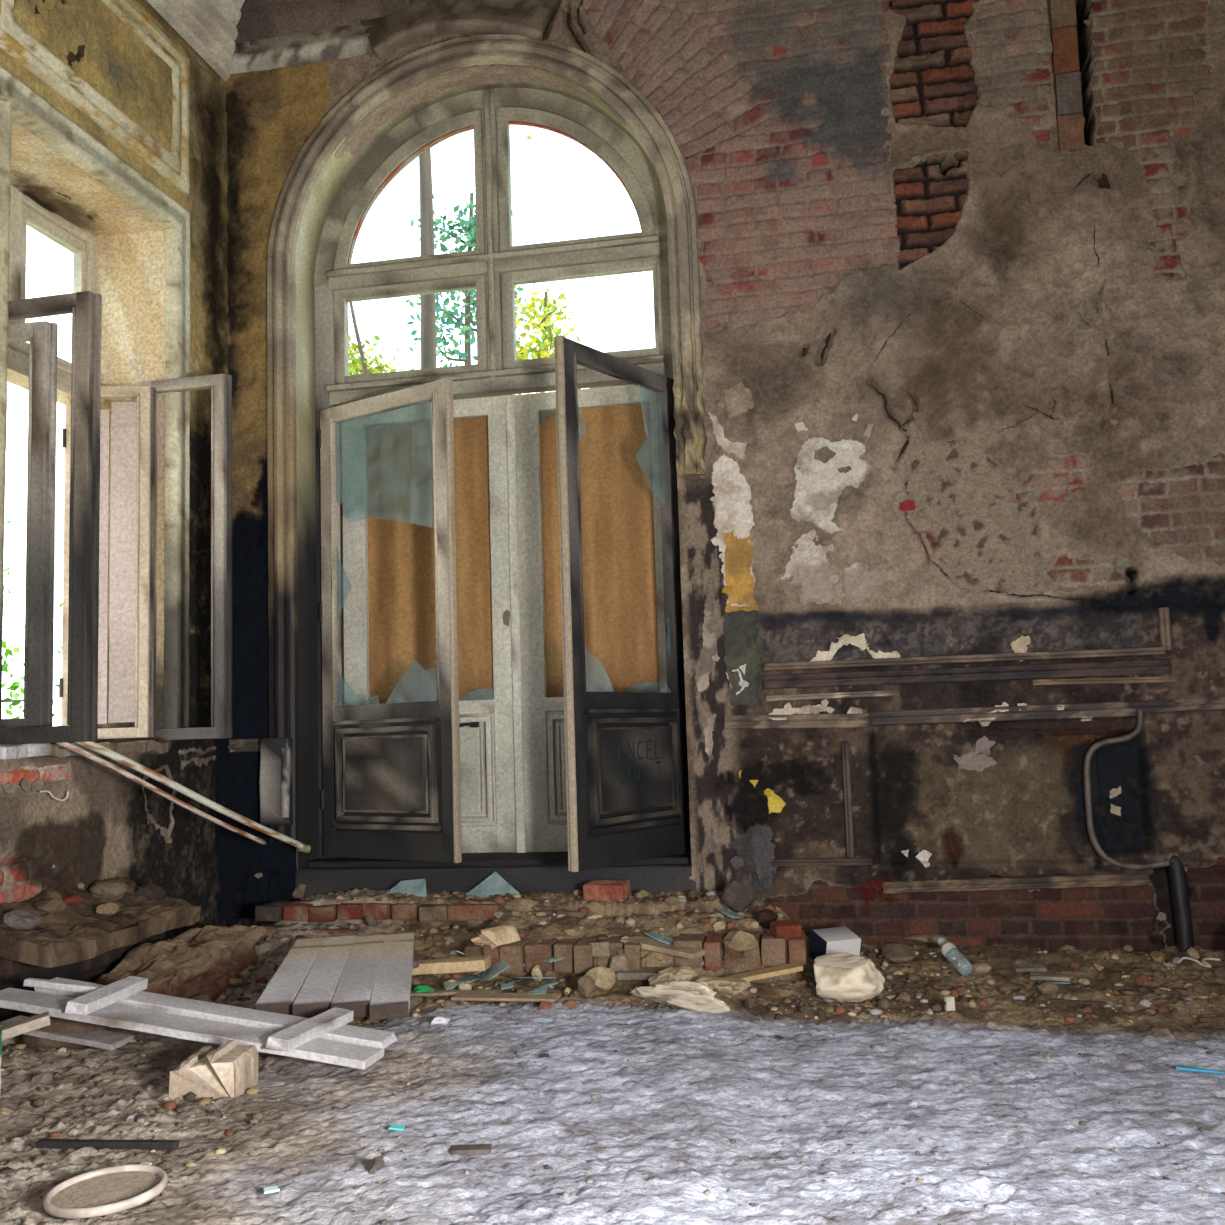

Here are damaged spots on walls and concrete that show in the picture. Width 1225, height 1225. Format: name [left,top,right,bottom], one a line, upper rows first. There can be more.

leakage [199,101,235,388]
leakage [254,459,268,564]
peeling [697,412,863,720]
flaking render [582,0,1057,329]
peeling [781,413,888,605]
crack [869,312,916,530]
flaking render [893,427,1139,594]
crack [1004,396,1061,429]
crack [984,590,1125,610]
crack [1079,225,1114,426]
leakage [1204,605,1220,641]
leakage [1092,820,1101,869]